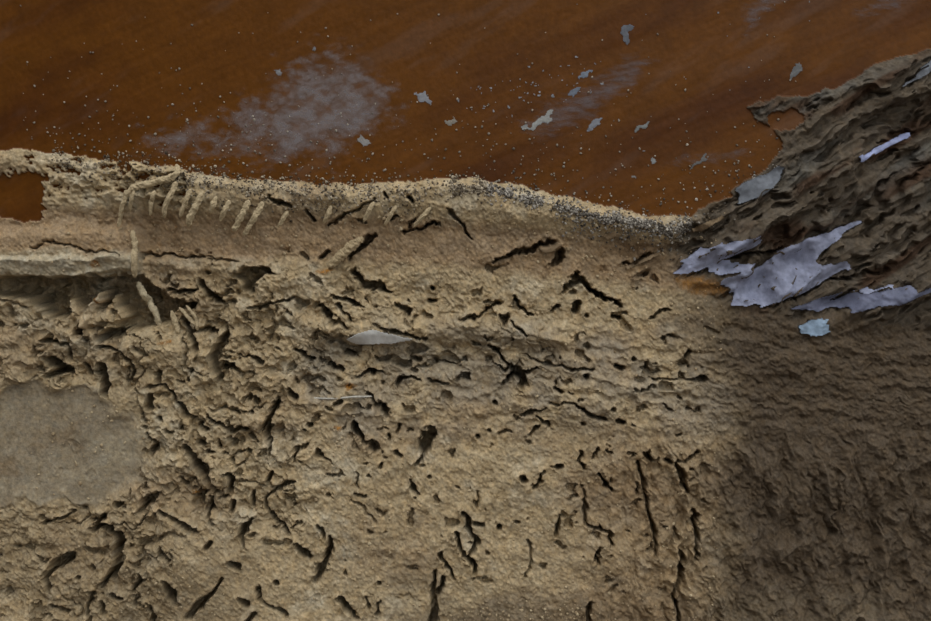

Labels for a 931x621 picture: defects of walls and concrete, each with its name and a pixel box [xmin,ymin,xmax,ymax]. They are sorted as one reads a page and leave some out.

peeling [859,133,910,162]
crack [29,240,240,265]
peeling [673,221,931,336]
spalling [374,327,429,342]
crack [524,353,595,374]
crack [549,401,609,423]
crack [263,480,304,538]
crack [581,488,615,550]
crack [635,460,660,562]
crack [183,577,225,621]
crack [255,584,290,621]
crack [428,569,446,621]